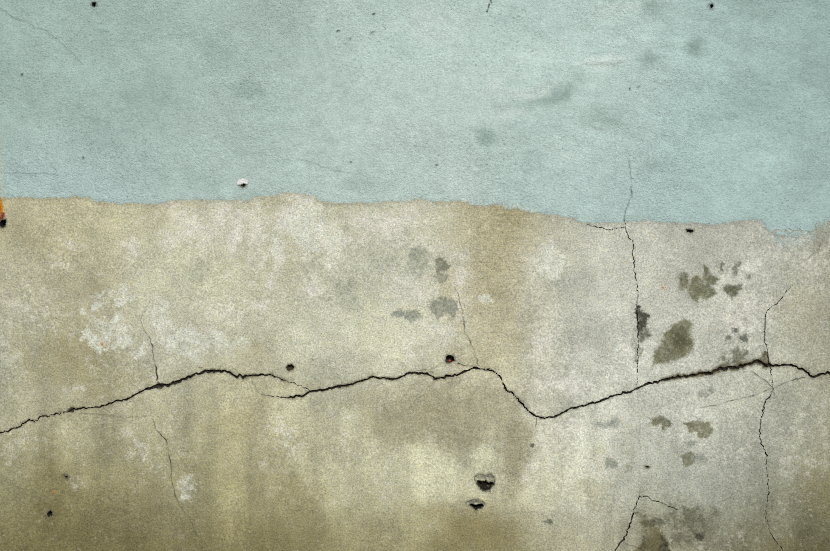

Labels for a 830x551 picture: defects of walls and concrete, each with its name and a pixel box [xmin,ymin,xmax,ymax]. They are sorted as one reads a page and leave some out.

crack [0,7,83,65]
crack [0,160,830,551]
flaking render [0,192,830,551]
water stain [367,198,572,551]
water stain [629,323,654,369]
mould [714,344,756,370]